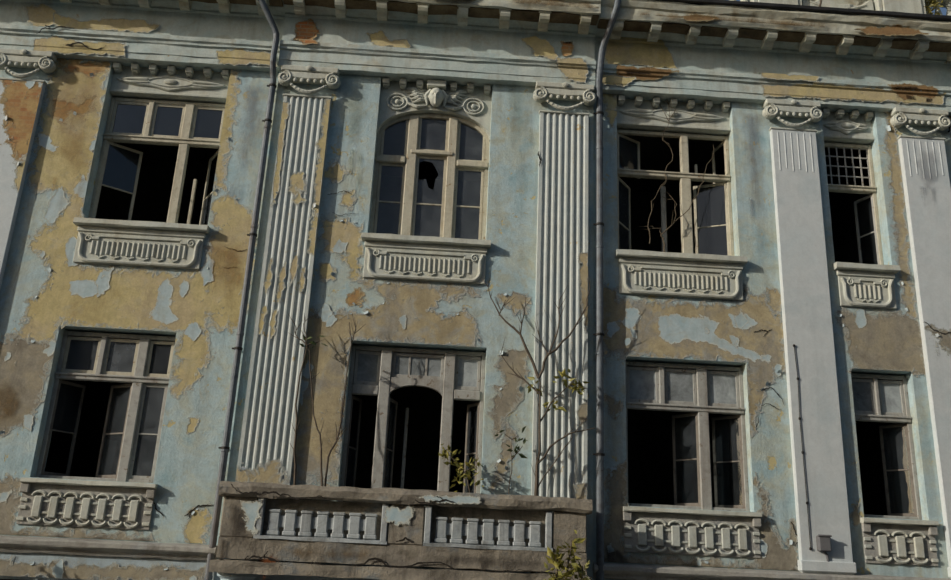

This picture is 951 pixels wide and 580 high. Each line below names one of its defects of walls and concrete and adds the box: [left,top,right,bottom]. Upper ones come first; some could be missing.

peeling [758,72,951,378]
peeling [0,3,532,492]
peeling [578,252,786,439]
crack [231,484,326,500]
crack [415,496,457,504]
crack [219,551,323,565]
crack [352,537,456,570]
crack [483,567,547,575]